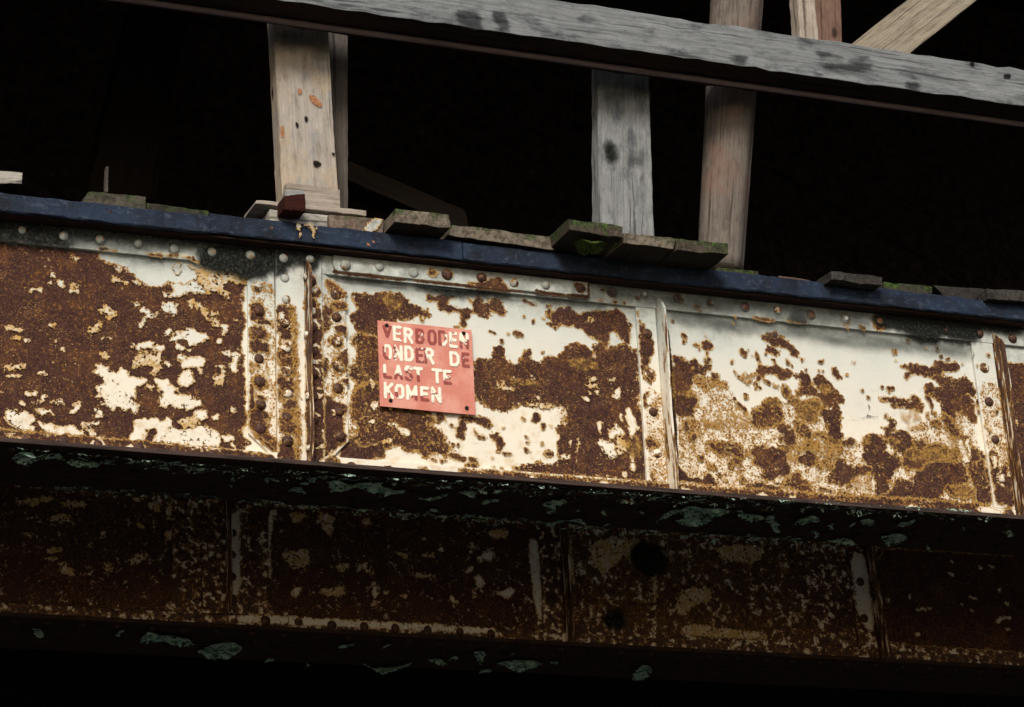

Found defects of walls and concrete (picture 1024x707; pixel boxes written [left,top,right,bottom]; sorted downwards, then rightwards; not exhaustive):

corrosion [247,267,1012,514]
peeling [0,242,1024,654]
peeling [140,632,242,660]
peeling [358,663,411,675]
peeling [474,651,558,674]